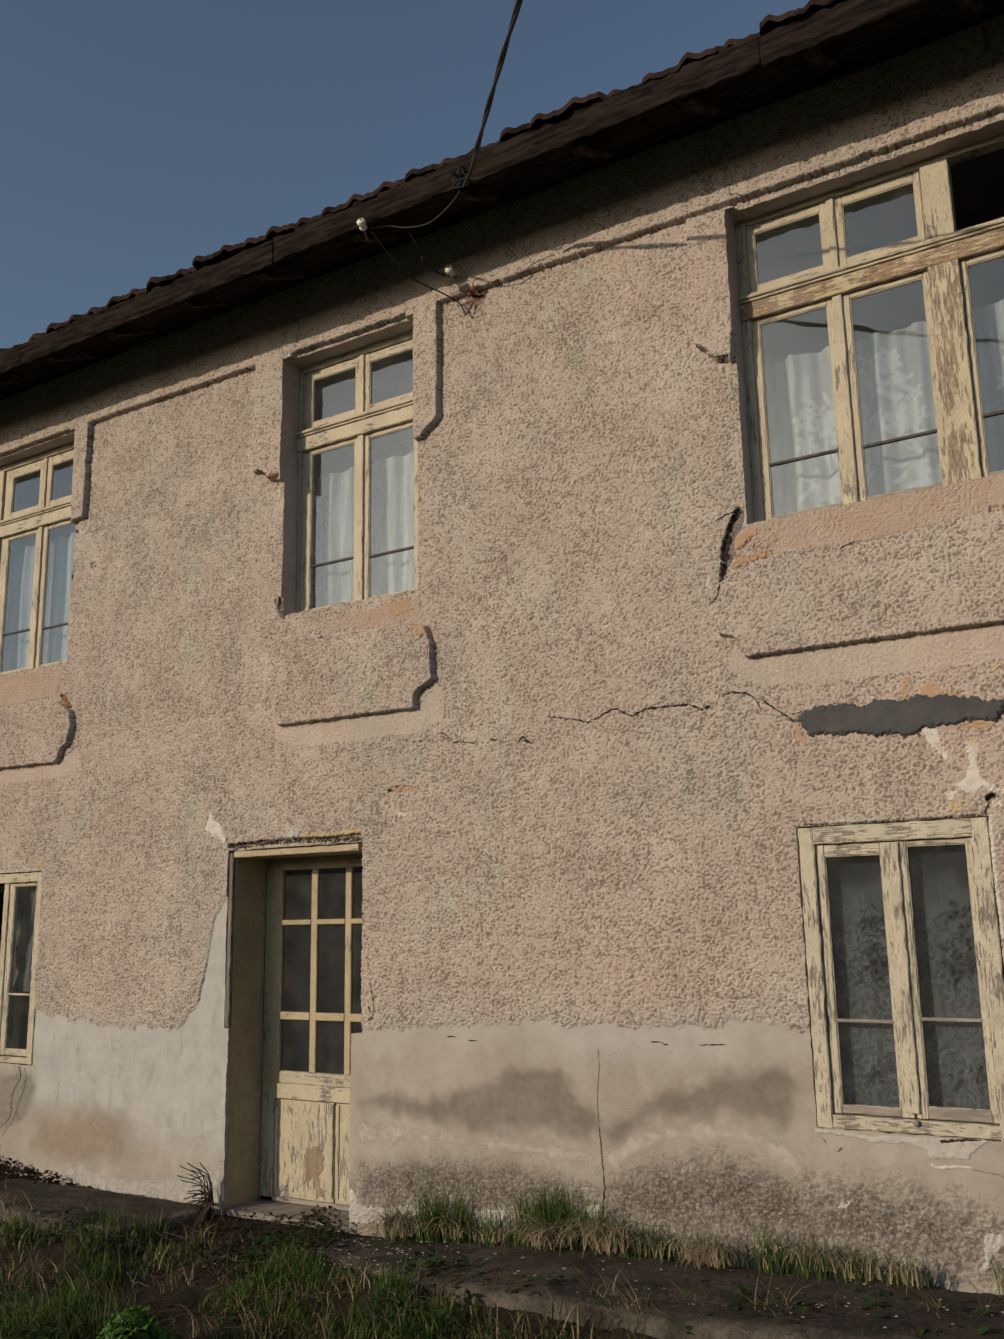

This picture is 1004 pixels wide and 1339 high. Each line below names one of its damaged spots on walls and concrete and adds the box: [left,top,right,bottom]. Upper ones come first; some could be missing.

spalling [705,506,796,604]
crack [411,691,801,781]
spalling [205,812,363,851]
flaking render [802,720,1004,939]
crack [596,1053,605,1209]
flaking render [815,1128,988,1170]
flaking render [349,1189,419,1225]
flaking render [474,1207,506,1228]
flaking render [579,1204,601,1221]
flaking render [979,1233,1004,1274]